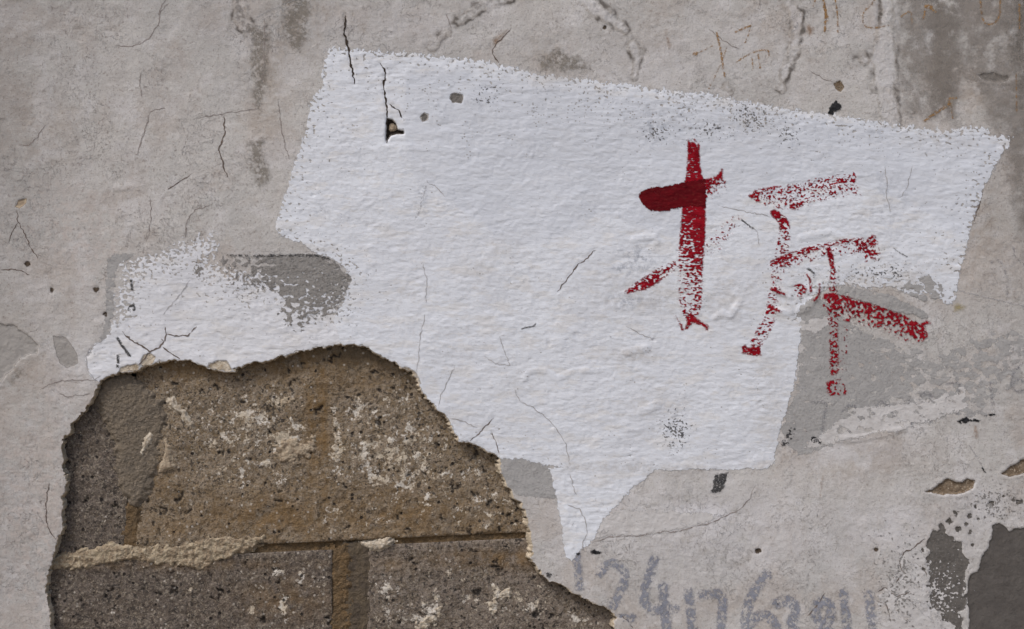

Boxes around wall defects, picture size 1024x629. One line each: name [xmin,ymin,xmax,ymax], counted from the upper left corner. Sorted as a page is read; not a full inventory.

crack [343,15,355,84]
crack [200,103,289,177]
crack [380,63,402,143]
peeling [837,259,944,319]
peeling [53,336,78,368]
crack [42,281,197,397]
peeling [780,297,1024,455]
peeling [657,407,692,455]
flaking render [45,344,632,629]
peeling [862,459,1024,629]